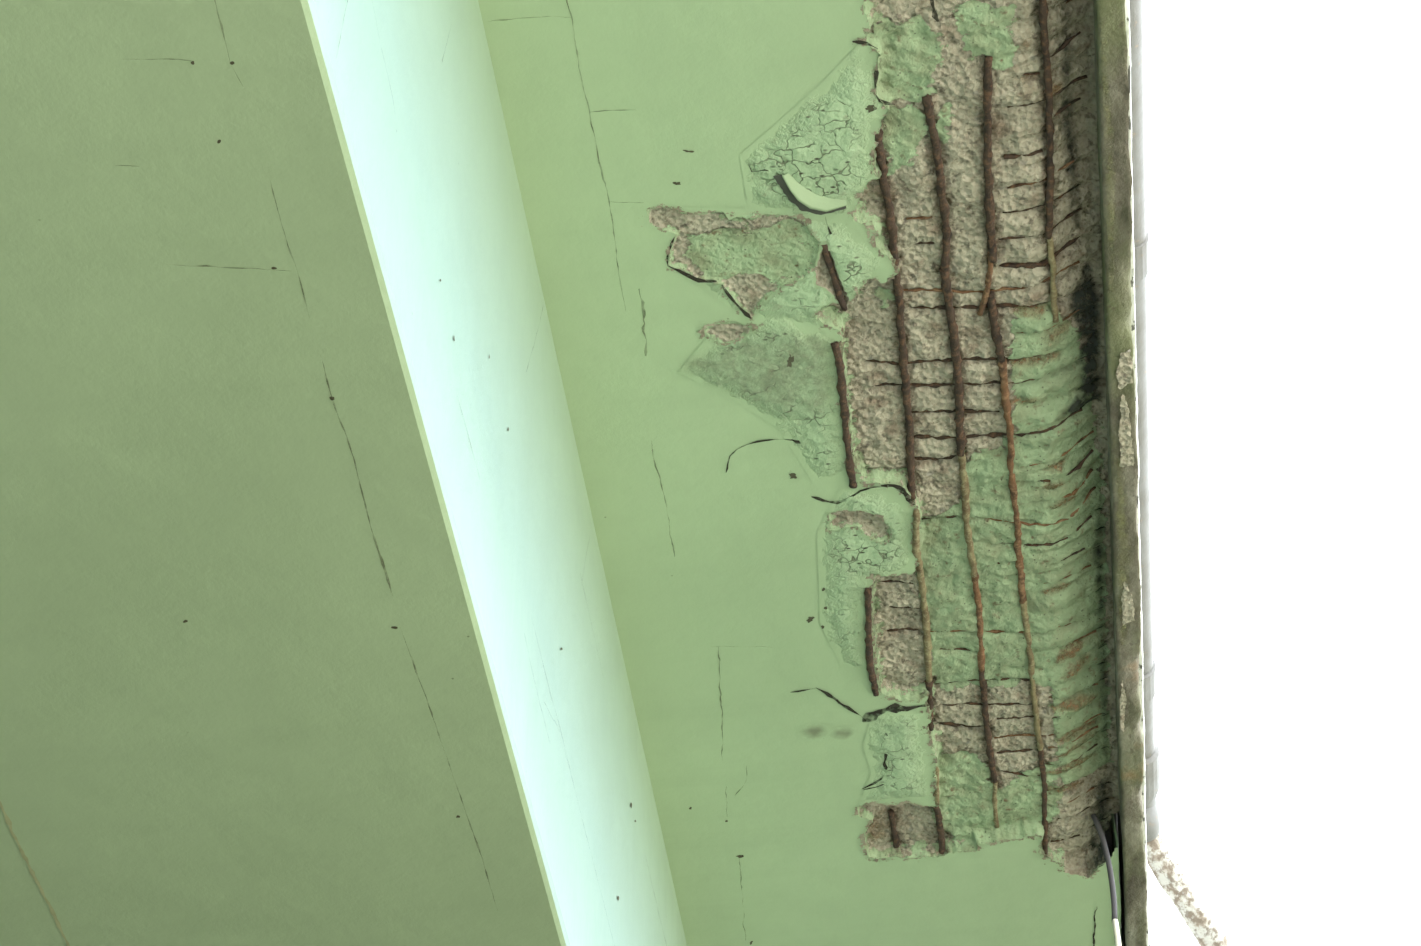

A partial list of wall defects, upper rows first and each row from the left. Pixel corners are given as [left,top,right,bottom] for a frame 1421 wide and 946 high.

crack [566,0,625,164]
crack [179,190,305,297]
crack [609,201,646,356]
crack [666,237,751,319]
crack [326,379,391,589]
crack [652,449,675,557]
spalling [647,0,1135,879]
crack [405,641,446,754]
corrosion [1046,694,1095,793]